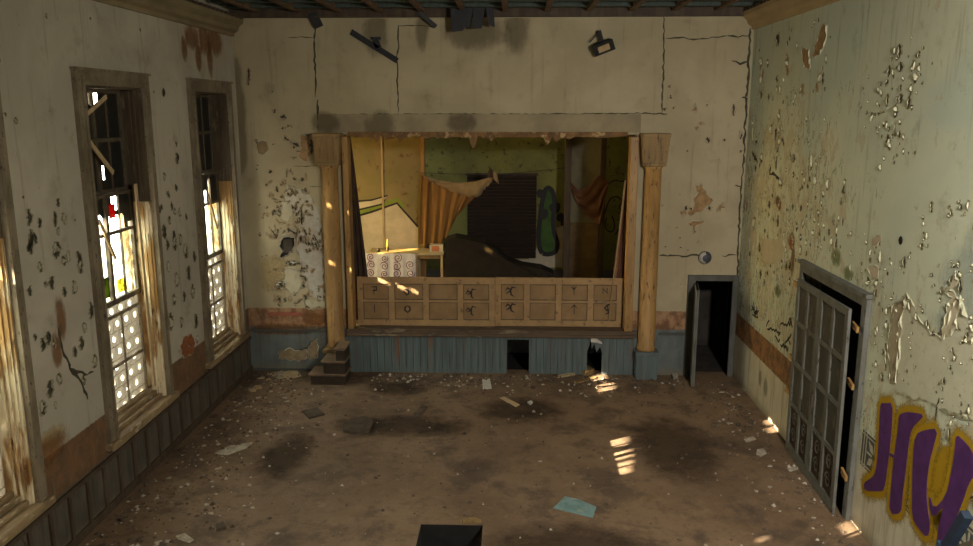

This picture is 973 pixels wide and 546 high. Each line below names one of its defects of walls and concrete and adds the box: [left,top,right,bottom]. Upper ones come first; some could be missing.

crack [289,29,319,128]
crack [363,25,432,114]
crack [437,17,751,275]
flaking render [253,109,326,311]
flaking render [675,183,726,251]
flaking render [738,22,973,445]
flaking render [278,338,319,362]